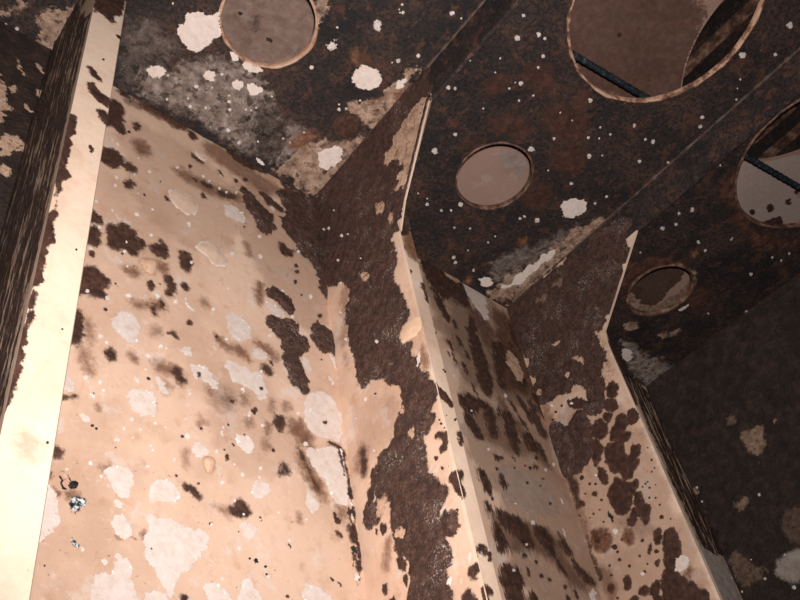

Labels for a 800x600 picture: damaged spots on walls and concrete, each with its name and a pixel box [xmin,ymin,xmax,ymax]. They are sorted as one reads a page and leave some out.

peeling [177,9,222,52]
peeling [352,65,382,90]
peeling [318,145,343,171]
rust [0,0,127,416]
peeling [560,198,596,218]
rust [87,66,800,600]
peeling [224,359,268,402]
peeling [90,514,213,600]